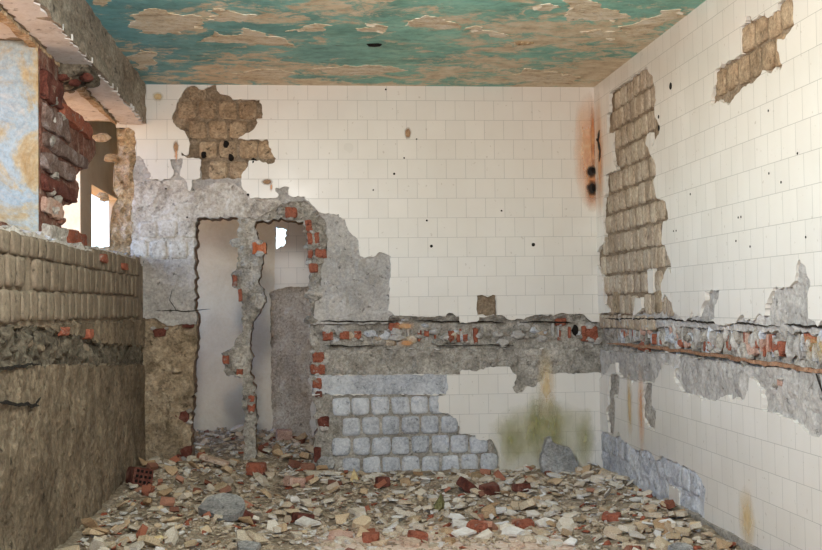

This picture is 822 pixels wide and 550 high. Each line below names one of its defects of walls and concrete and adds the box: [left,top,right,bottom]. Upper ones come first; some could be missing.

peeling [128,7,332,48]
peeling [356,23,388,34]
peeling [405,15,510,38]
peeling [126,50,158,71]
peeling [715,0,794,103]
rust [584,118,601,199]
spalling [0,63,500,550]
peeling [555,70,822,518]
rust [607,343,822,374]
spalling [512,483,531,492]